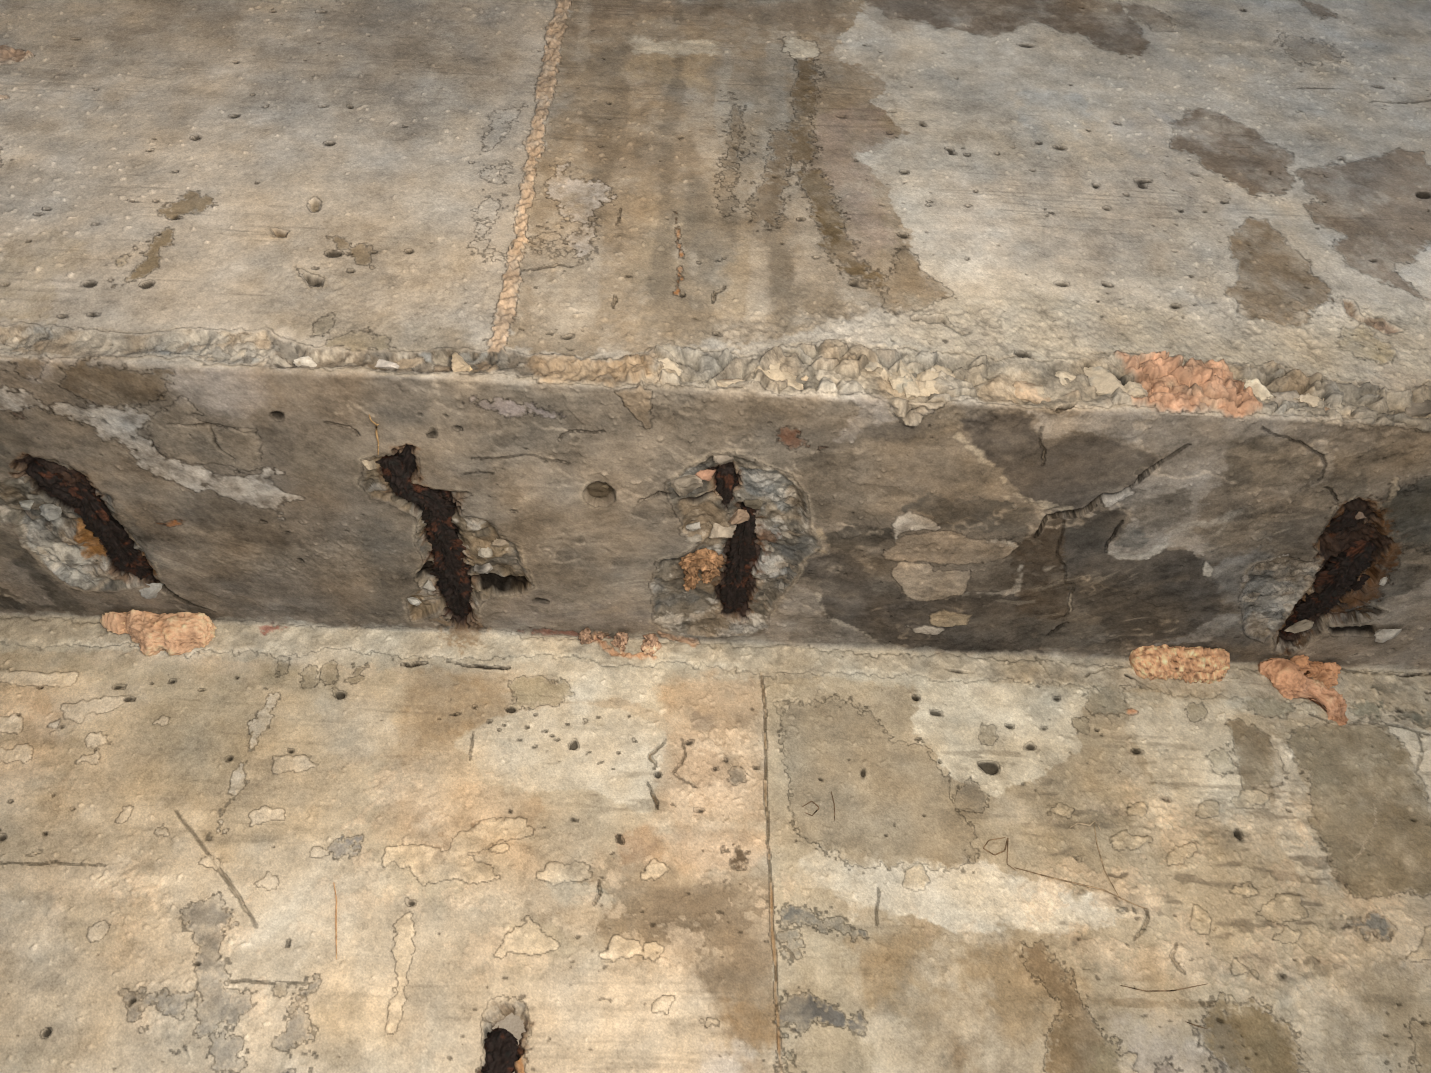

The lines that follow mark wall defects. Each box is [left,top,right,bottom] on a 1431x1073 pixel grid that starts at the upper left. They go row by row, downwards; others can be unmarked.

leakage [715,37,953,312]
leakage [1225,218,1334,327]
leakage [1170,107,1431,301]
crack [1038,402,1077,466]
spalling [0,454,164,599]
spalling [357,444,535,627]
spalling [648,451,822,639]
crack [1034,444,1188,689]
spalling [1237,475,1405,658]